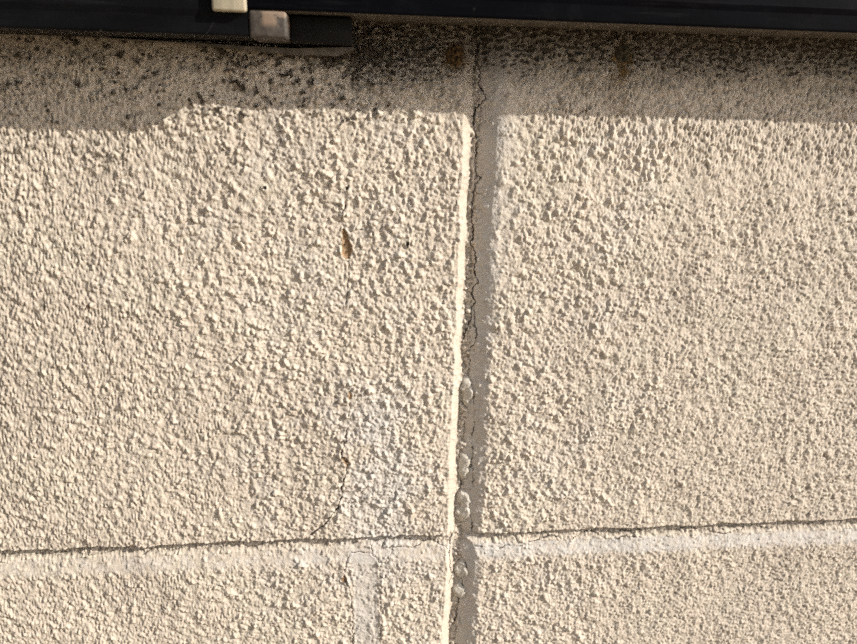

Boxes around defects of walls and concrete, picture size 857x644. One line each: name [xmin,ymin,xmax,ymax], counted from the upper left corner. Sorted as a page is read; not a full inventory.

leakage [0,21,857,135]
crack [463,30,486,365]
crack [311,343,355,535]
crack [339,395,643,642]